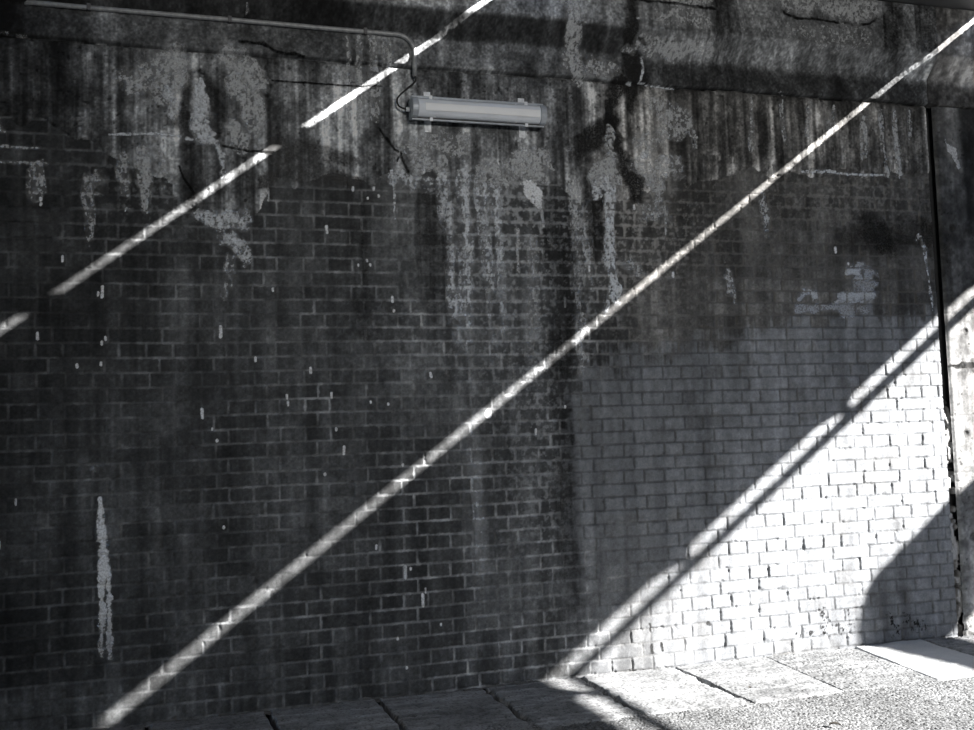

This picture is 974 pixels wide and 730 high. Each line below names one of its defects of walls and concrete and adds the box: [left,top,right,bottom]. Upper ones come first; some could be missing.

spalling [173,69,225,131]
leakage [388,0,698,373]
leakage [801,109,912,179]
leakage [96,497,113,646]